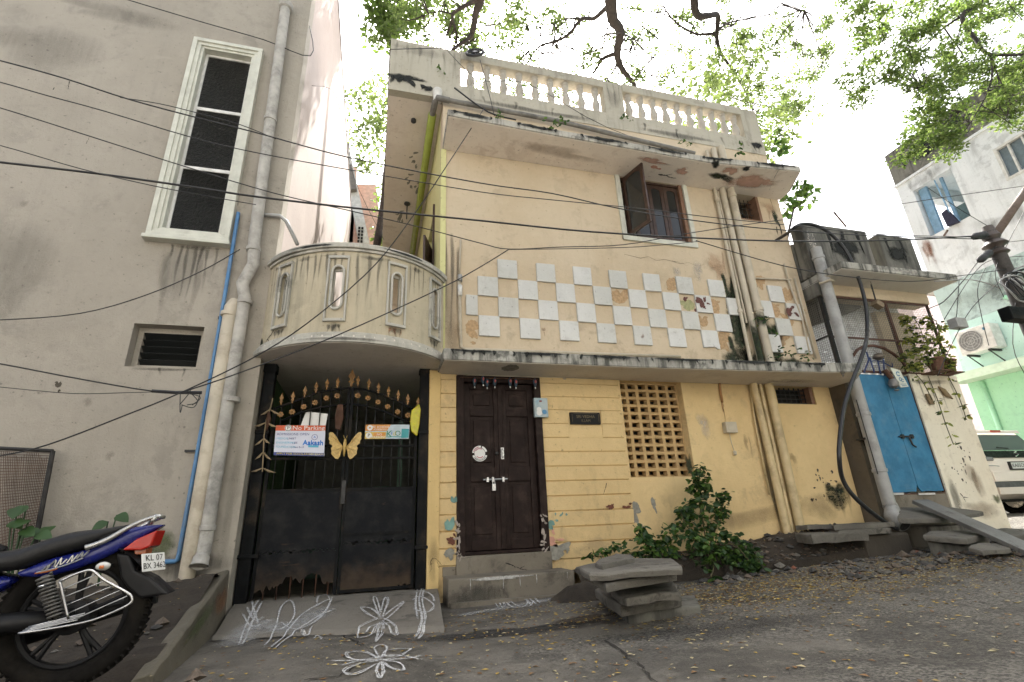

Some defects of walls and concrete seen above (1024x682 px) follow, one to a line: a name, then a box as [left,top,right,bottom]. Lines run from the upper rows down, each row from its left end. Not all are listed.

damp [387,73,432,91]
peeling [723,168,770,187]
peeling [666,278,720,327]
damp [825,483,847,509]
peeling [444,517,465,562]
peeling [540,512,571,561]